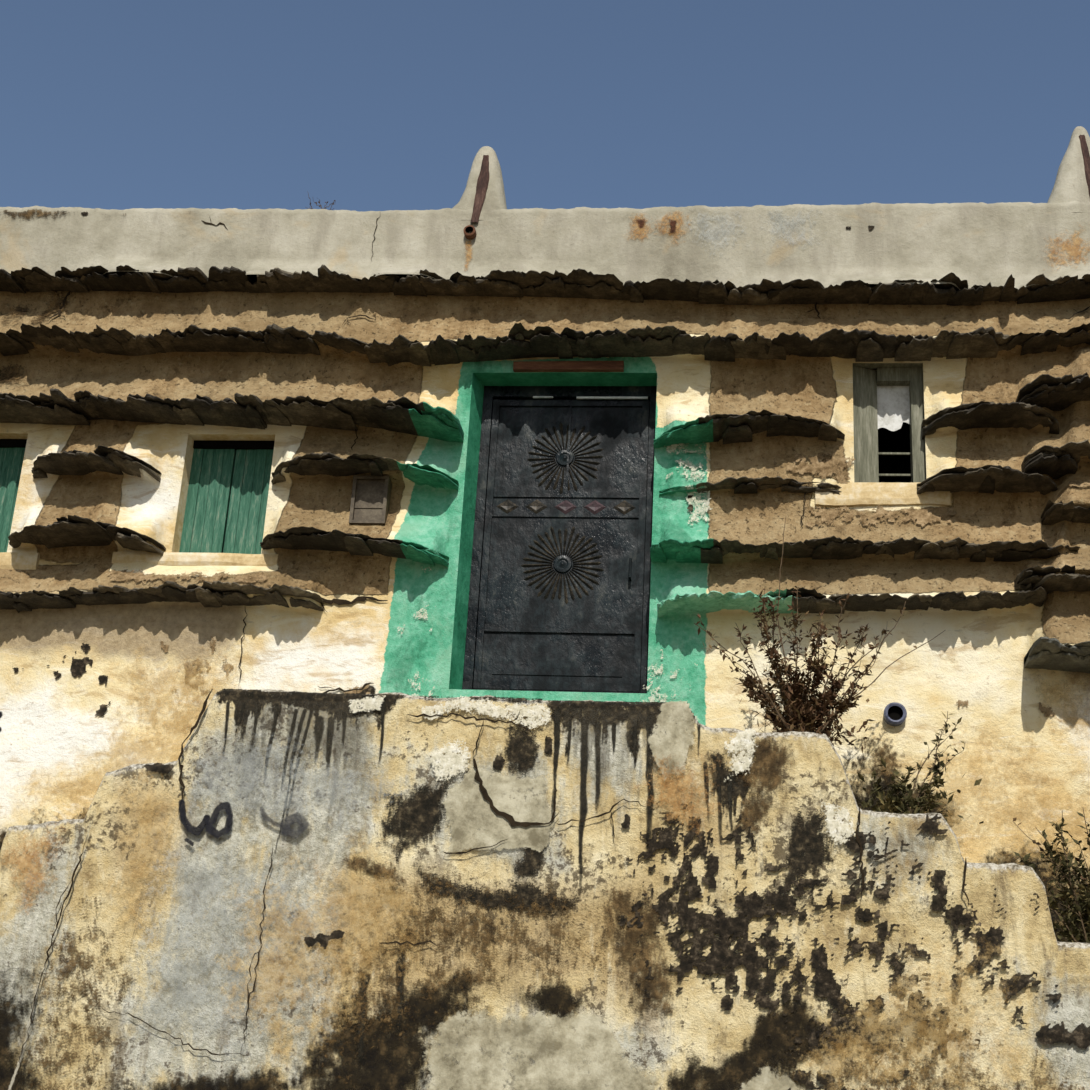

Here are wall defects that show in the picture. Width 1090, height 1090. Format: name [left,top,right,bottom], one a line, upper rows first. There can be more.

corrosion [630,212,683,241]
peeling [666,442,713,525]
crack [16,834,88,1081]
flaking render [47,643,108,686]
crack [96,848,273,1057]
crack [178,610,247,814]
leakage [0,689,678,1090]
crack [407,712,645,854]
flaking render [642,654,698,781]
leakage [687,703,795,836]
leakage [783,810,833,884]
leakage [667,992,1085,1090]